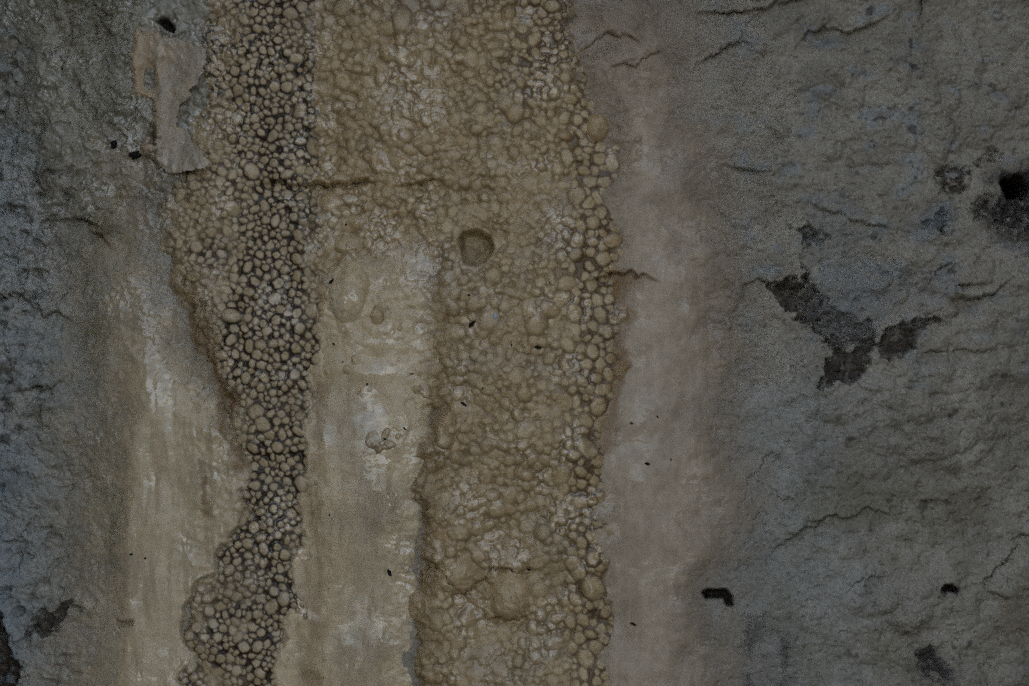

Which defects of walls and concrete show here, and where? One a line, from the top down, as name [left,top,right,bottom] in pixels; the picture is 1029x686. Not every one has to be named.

peeling [127,25,209,173]
leakage [0,0,750,686]
spalling [766,276,941,387]
spalling [0,614,22,686]